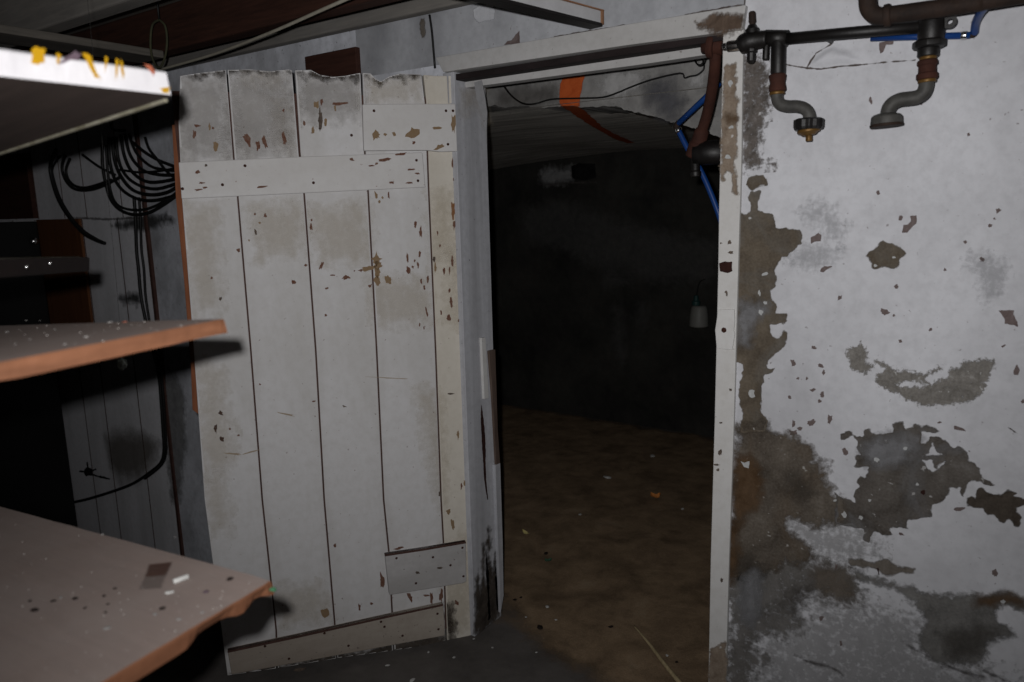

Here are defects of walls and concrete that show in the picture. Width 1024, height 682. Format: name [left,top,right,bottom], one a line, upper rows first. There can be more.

flaking render [720,175,821,433]
flaking render [867,241,906,269]
flaking render [845,341,995,406]
peeling [999,310,1018,327]
flaking render [835,421,1024,543]
damp [727,418,1024,682]